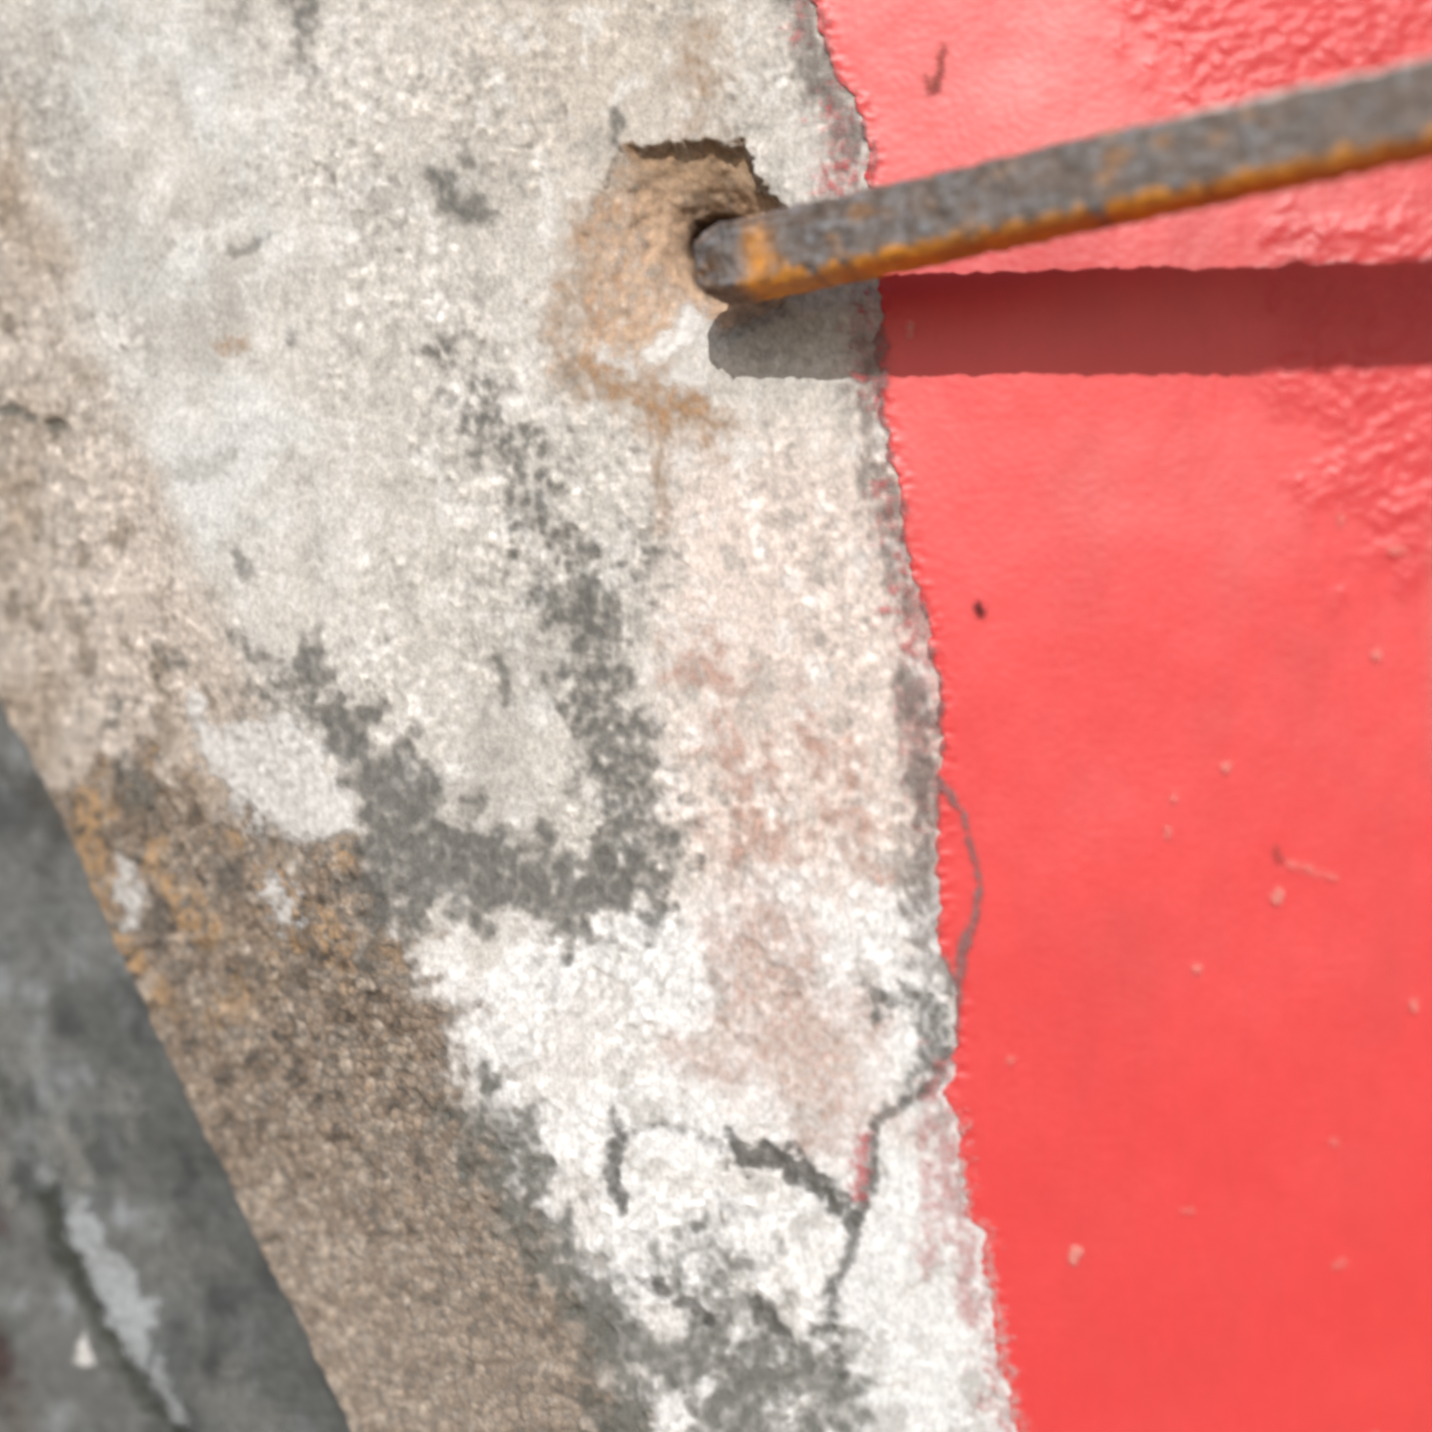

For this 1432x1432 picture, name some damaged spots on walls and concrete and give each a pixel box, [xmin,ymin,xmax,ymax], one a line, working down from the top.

damp [423,338,450,354]
rust [591,368,717,440]
spalling [576,139,785,396]
rust [694,55,1432,306]
damp [186,378,680,937]
peeling [872,479,945,750]
peeling [934,775,982,1039]
spalling [50,737,616,1432]
crack [606,1111,627,1212]
damp [441,1063,870,1432]
crack [637,1278,713,1324]
crack [726,1047,952,1376]